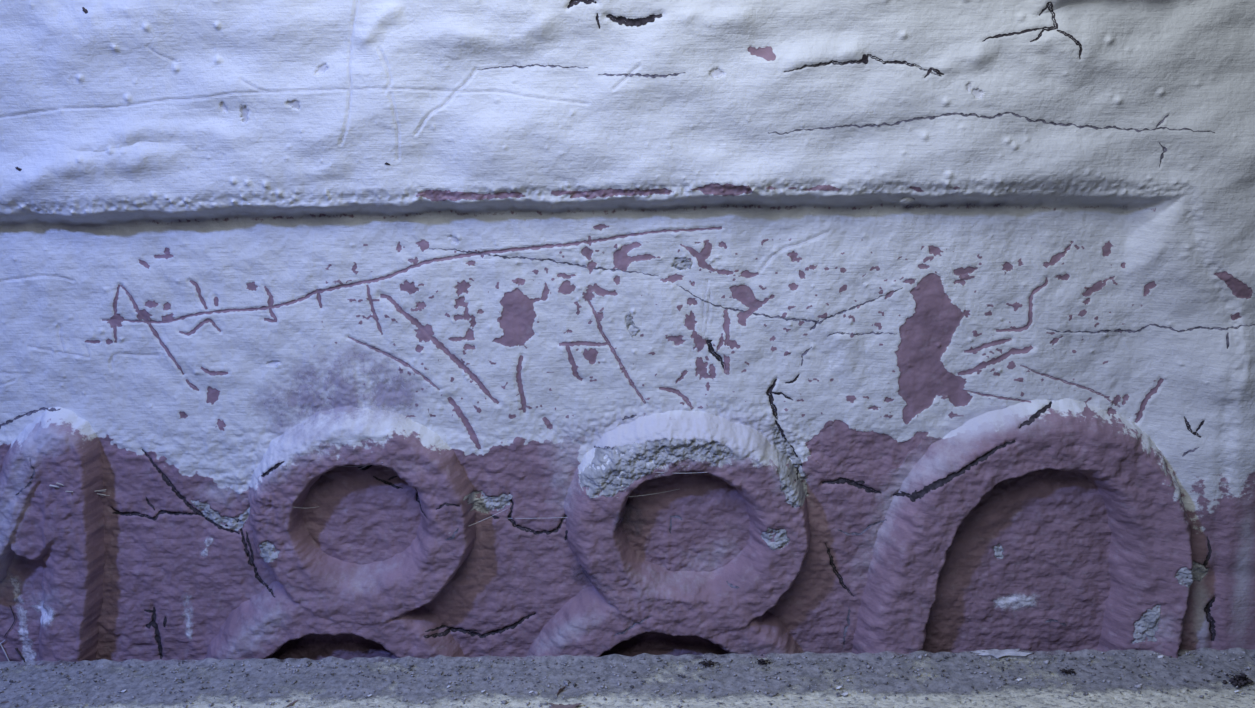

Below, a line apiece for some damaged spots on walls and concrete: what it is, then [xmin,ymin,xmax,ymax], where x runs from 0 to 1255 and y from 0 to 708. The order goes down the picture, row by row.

crack [567,0,662,29]
crack [982,2,1082,59]
crack [784,54,944,78]
crack [768,112,1215,168]
peeling [400,280,426,309]
peeling [415,324,434,353]
peeling [449,280,484,350]
peeling [492,224,774,383]
peeling [773,245,978,508]
spalling [578,438,733,498]
crack [423,248,1052,648]
crack [110,449,274,597]